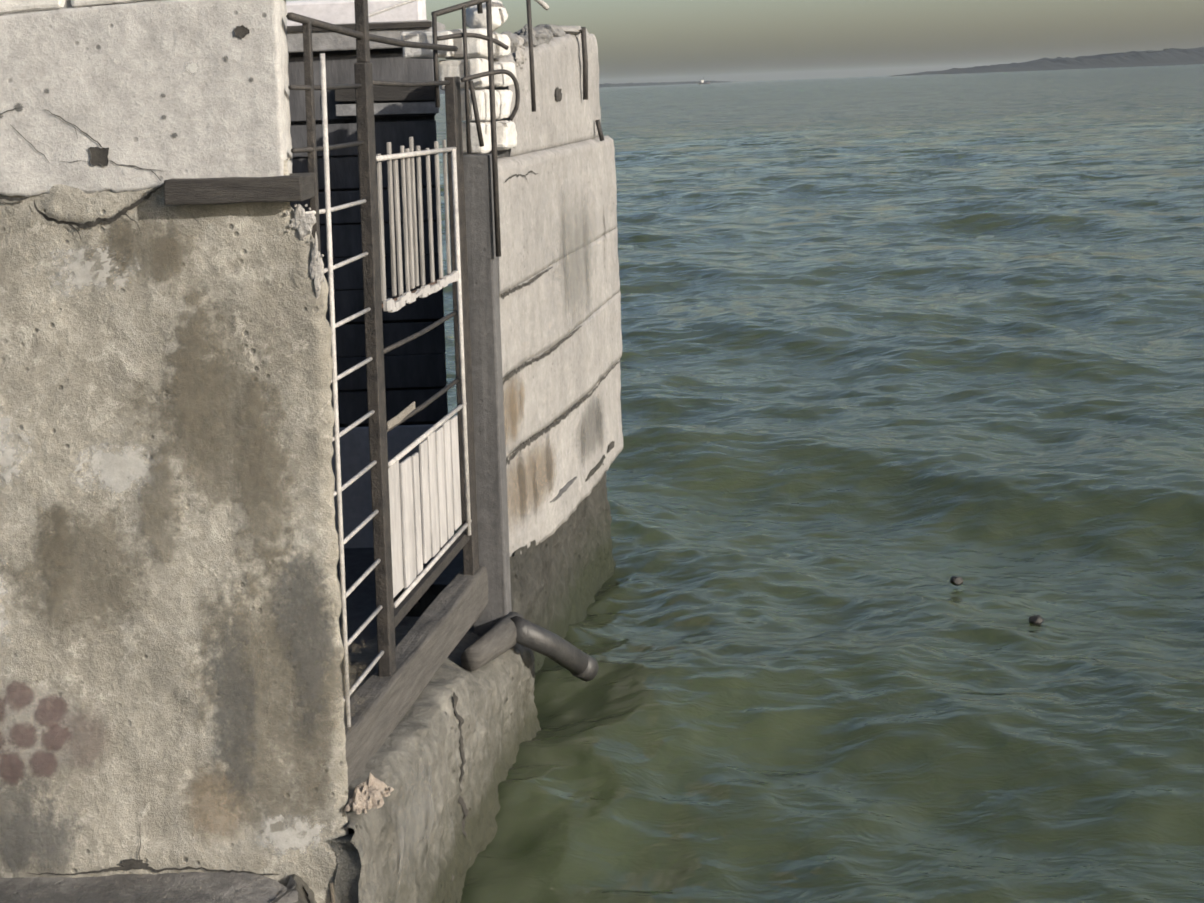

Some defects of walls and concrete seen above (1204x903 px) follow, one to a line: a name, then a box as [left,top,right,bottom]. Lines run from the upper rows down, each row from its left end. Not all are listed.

crack [0,108,161,239]
water stain [275,556,332,725]